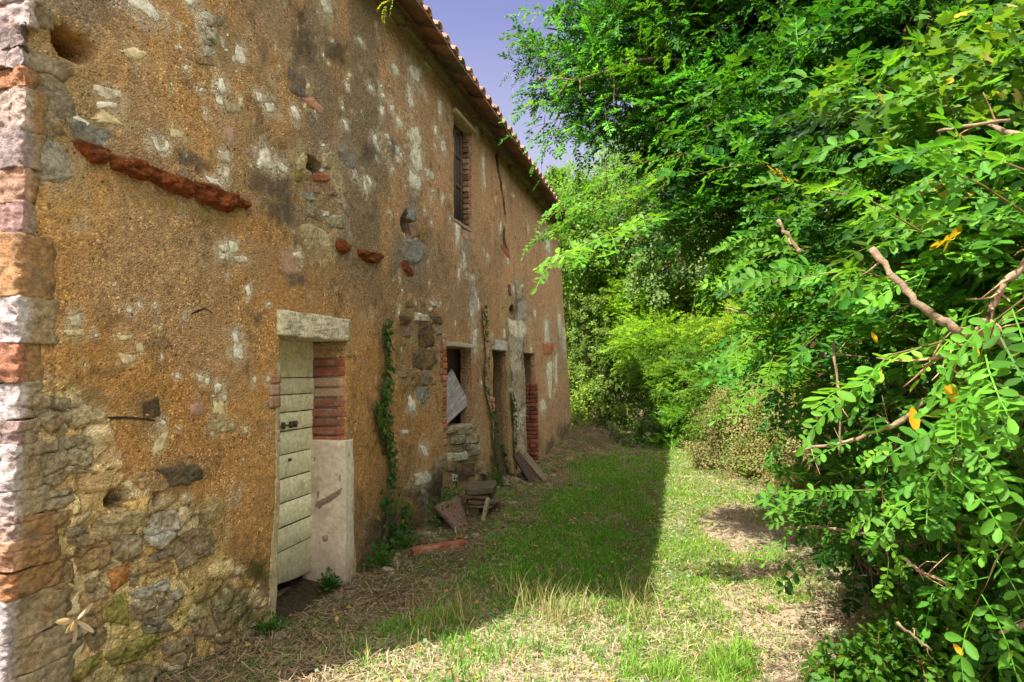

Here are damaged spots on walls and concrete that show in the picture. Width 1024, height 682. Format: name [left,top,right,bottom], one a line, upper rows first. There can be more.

spalling [368,61,456,413]
crack [495,155,512,297]
spalling [32,393,259,682]
peeling [189,374,250,438]